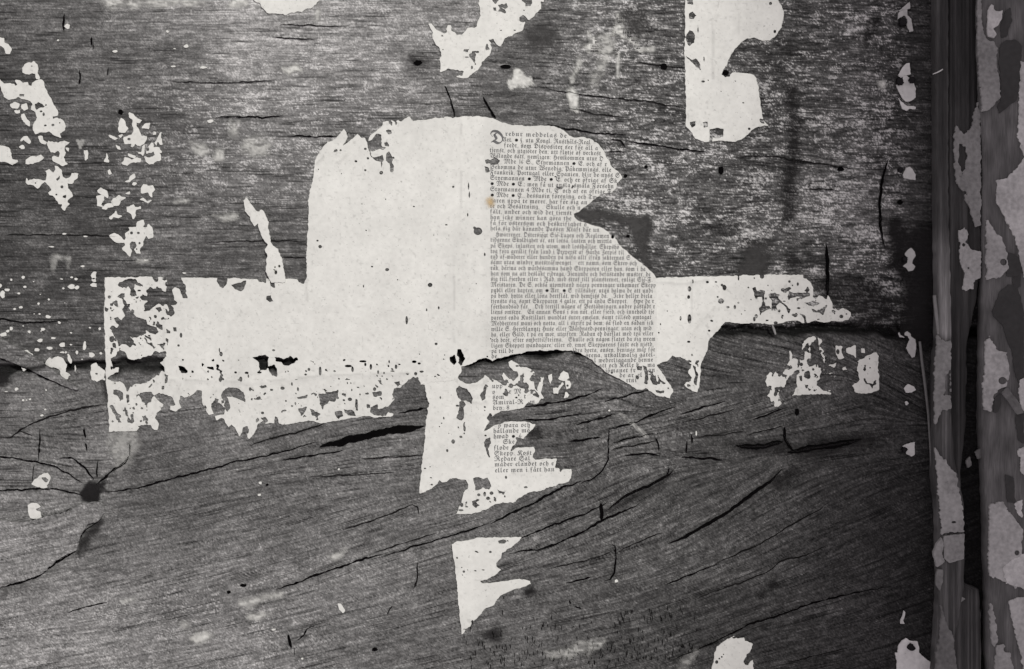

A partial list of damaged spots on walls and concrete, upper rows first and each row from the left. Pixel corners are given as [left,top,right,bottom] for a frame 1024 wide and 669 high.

peeling [22,61,40,79]
peeling [997,8,1022,113]
peeling [0,102,47,165]
peeling [96,118,163,219]
peeling [575,209,654,267]
peeling [739,241,770,275]
crack [878,160,888,247]
peeling [992,253,1024,383]
crack [0,358,424,520]
peeling [1005,402,1024,517]
crack [2,519,101,587]
crack [275,389,891,669]